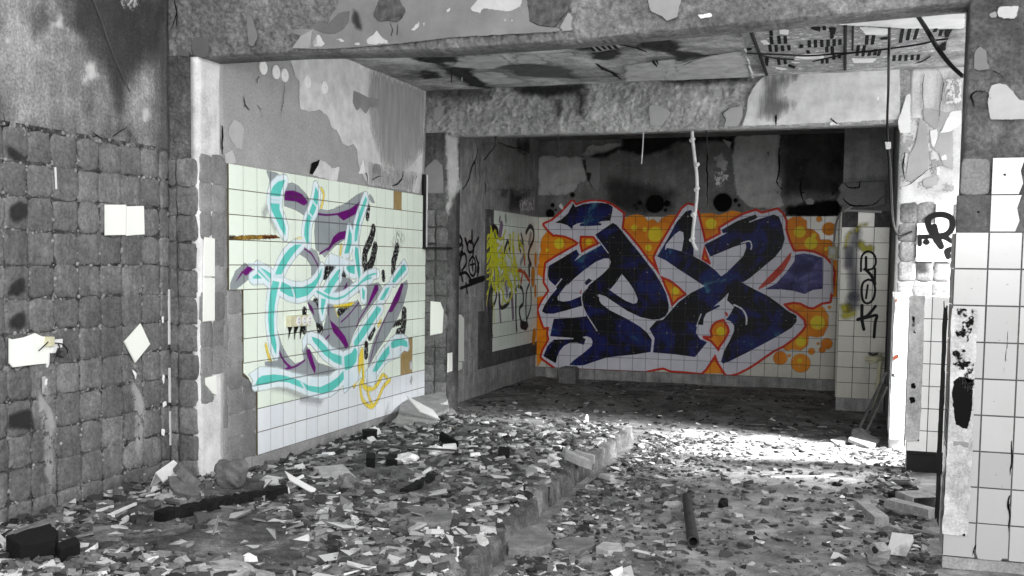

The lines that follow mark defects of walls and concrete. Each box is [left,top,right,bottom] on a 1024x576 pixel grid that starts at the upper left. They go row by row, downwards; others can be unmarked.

water stain [70,0,169,153]
flaking render [224,119,244,164]
flaking render [290,0,426,193]
spalling [470,0,570,27]
spalling [740,24,953,78]
peeling [898,76,962,192]